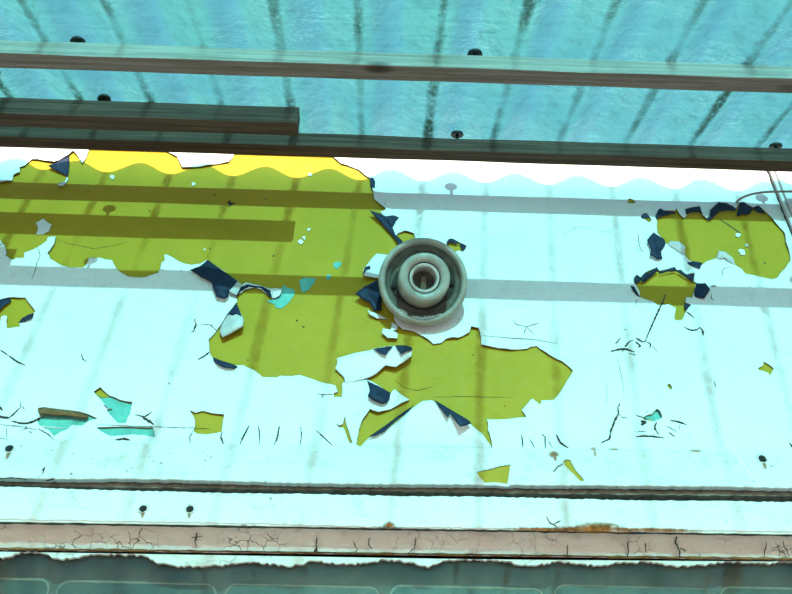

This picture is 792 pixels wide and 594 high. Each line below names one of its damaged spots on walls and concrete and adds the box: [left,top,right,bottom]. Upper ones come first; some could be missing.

peeling [631,202,790,320]
peeling [0,150,572,448]
crack [684,311,704,336]
crack [599,294,687,444]
crack [0,402,54,440]
peeling [634,409,662,426]
peeling [475,463,512,487]
peeling [561,458,586,484]
corrosion [515,523,688,533]